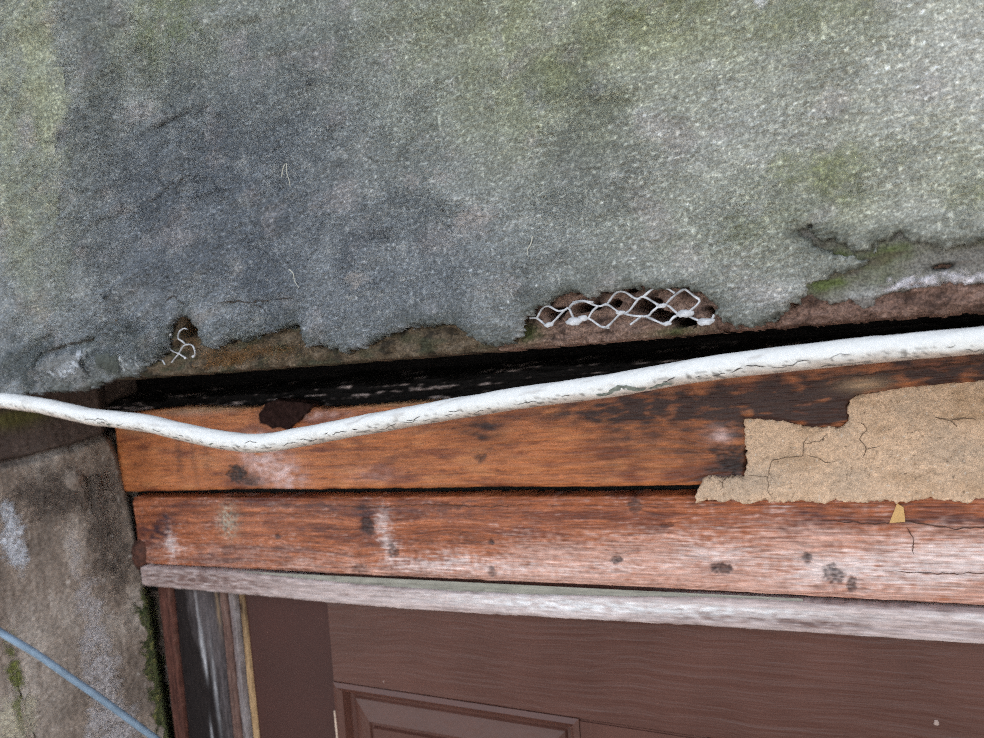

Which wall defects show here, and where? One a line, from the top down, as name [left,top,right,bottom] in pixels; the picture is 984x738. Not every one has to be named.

spalling [39,225,984,383]
crack [935,417,975,427]
crack [720,434,835,499]